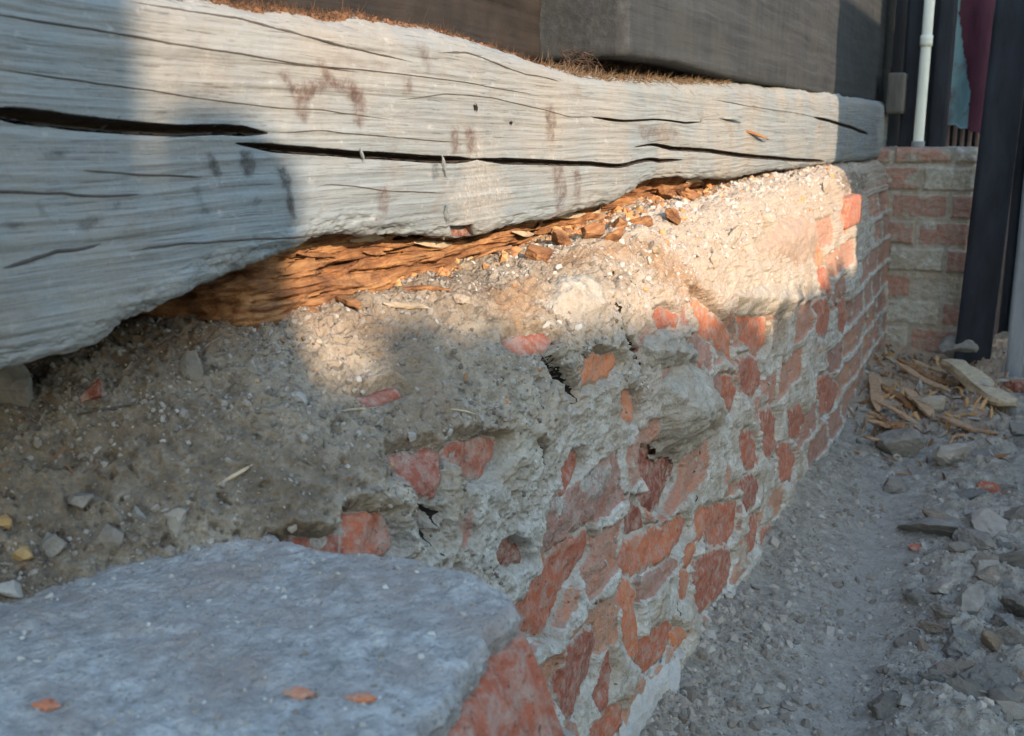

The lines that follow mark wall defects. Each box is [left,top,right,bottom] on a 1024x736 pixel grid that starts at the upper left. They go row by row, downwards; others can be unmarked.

spalling [811,243,848,339]
spalling [501,333,552,358]
crack [541,355,578,404]
spalling [579,351,616,388]
spalling [816,371,838,418]
spalling [385,434,496,505]
spalling [557,450,576,497]
spalling [615,294,805,674]
spalling [281,511,392,557]
spalling [496,538,521,567]
spalling [515,526,587,638]
spalling [548,624,622,736]